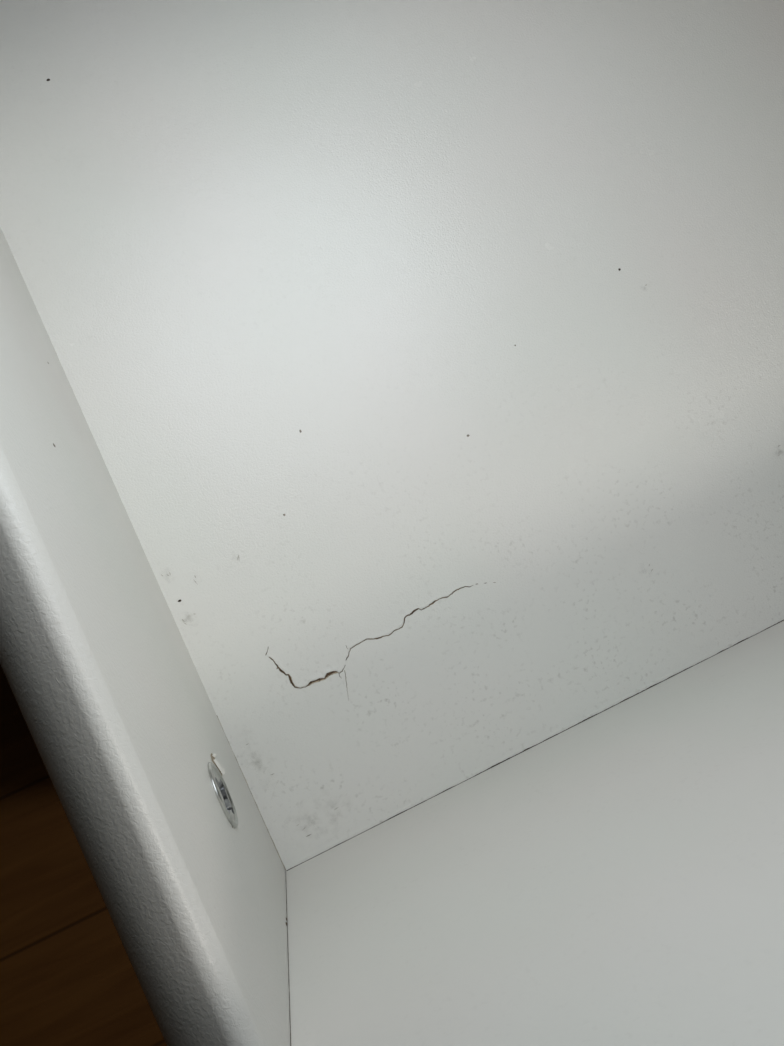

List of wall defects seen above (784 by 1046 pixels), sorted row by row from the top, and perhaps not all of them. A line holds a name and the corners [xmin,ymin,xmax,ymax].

crack [266,582,496,701]
crack [217,620,784,1039]